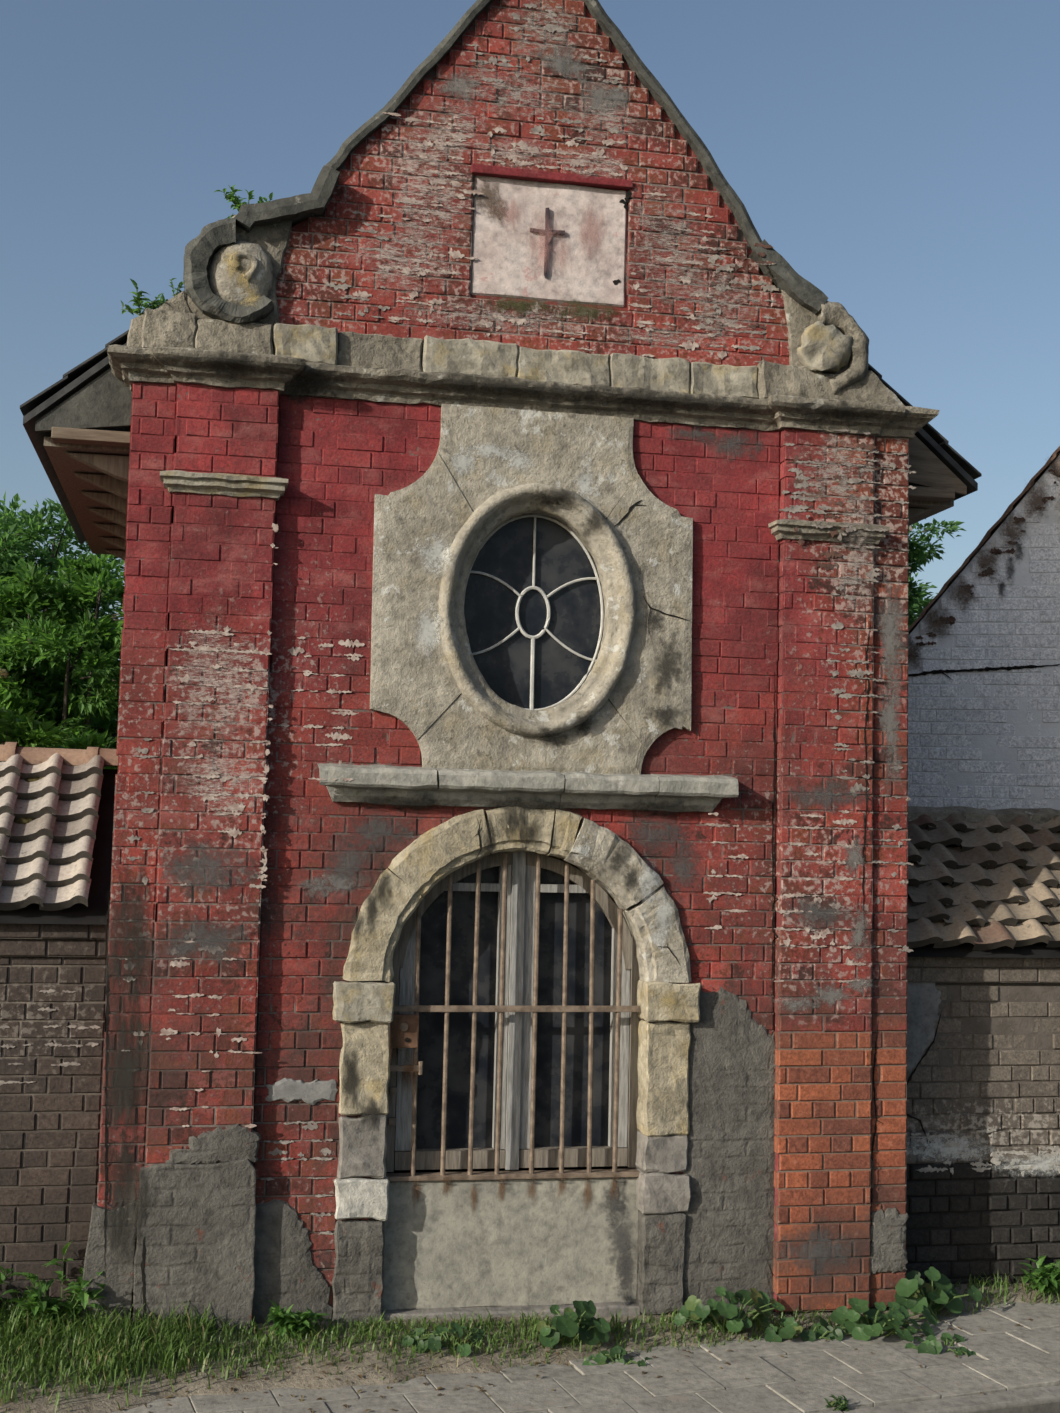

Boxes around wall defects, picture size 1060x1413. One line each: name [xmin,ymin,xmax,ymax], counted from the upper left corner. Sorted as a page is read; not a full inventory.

peeling [325,56,668,323]
crack [615,500,646,526]
peeling [779,429,916,601]
leakage [908,487,1045,667]
peeling [169,626,365,781]
crack [908,664,1060,680]
peeling [136,738,271,889]
peeling [774,621,914,983]
peeling [121,993,262,1127]
leakage [344,1055,380,1126]
leakage [907,1137,986,1158]
leakage [1005,1156,1060,1173]